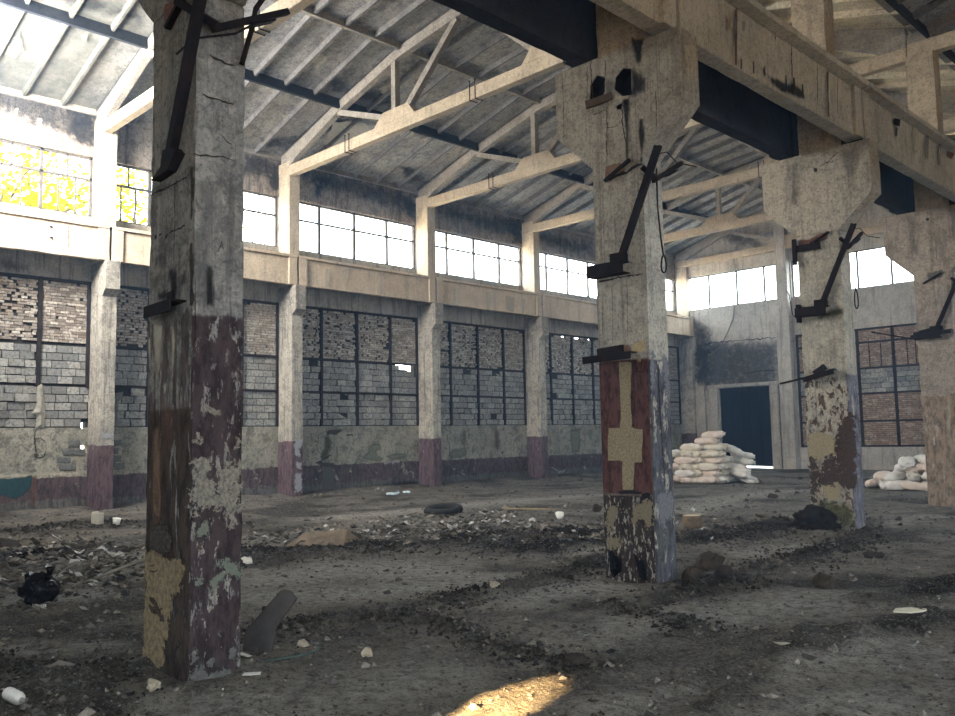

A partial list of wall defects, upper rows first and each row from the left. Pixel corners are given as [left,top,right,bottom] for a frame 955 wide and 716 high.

water stain [404,200,416,219]
peeling [185,432,245,540]
peeling [606,340,671,576]
peeling [807,412,861,505]
peeling [142,549,244,672]
spalling [634,554,648,580]
peeling [188,645,239,681]